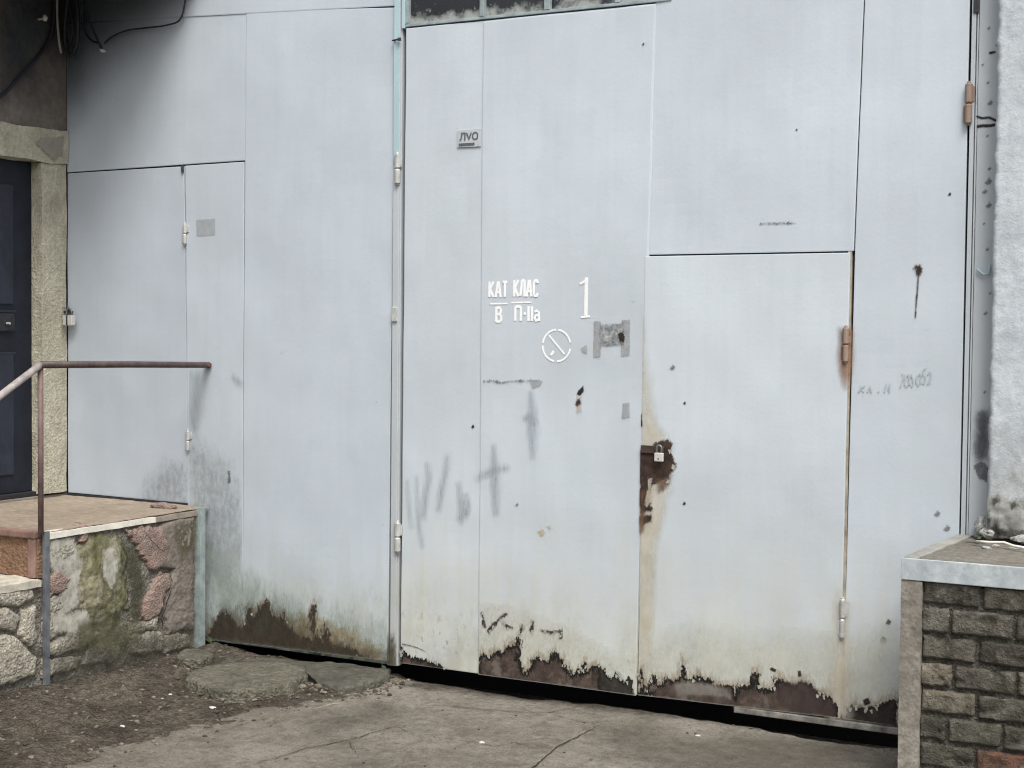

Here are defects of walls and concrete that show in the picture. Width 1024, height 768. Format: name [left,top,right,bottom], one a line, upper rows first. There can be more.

rust [912,265,923,318]
rust [840,330,851,380]
rust [639,413,677,691]
rust [205,598,384,660]
peeling [399,647,445,670]
peeling [479,611,899,726]